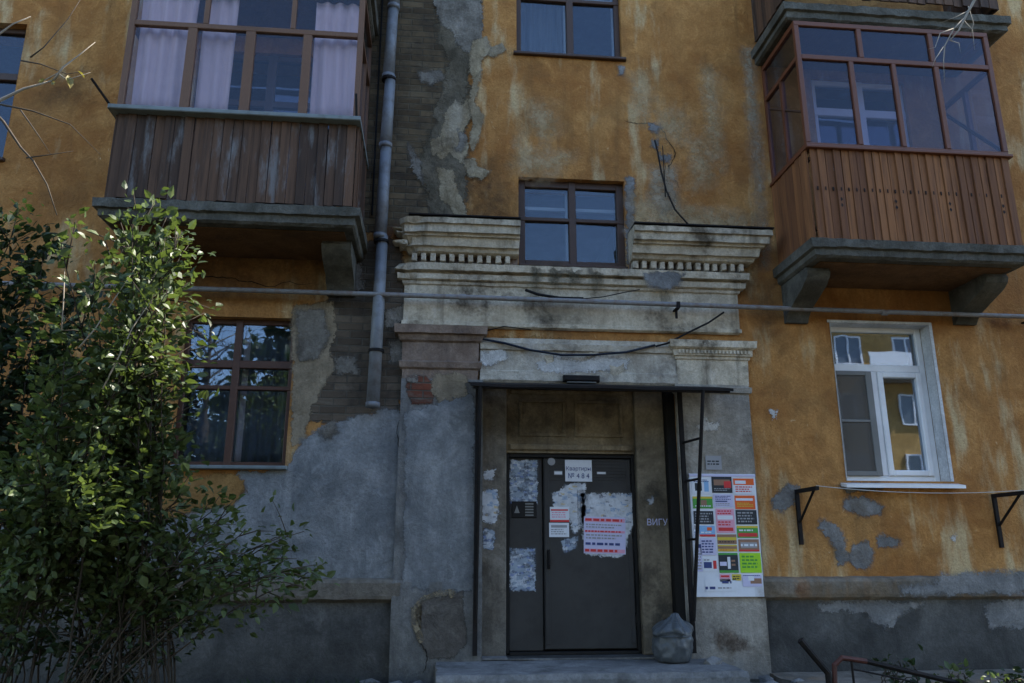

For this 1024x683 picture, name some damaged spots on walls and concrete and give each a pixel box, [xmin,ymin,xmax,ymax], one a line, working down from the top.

flaking render [309,0,509,441]
damp [533,266,579,288]
spalling [839,482,884,494]
spalling [411,589,467,672]